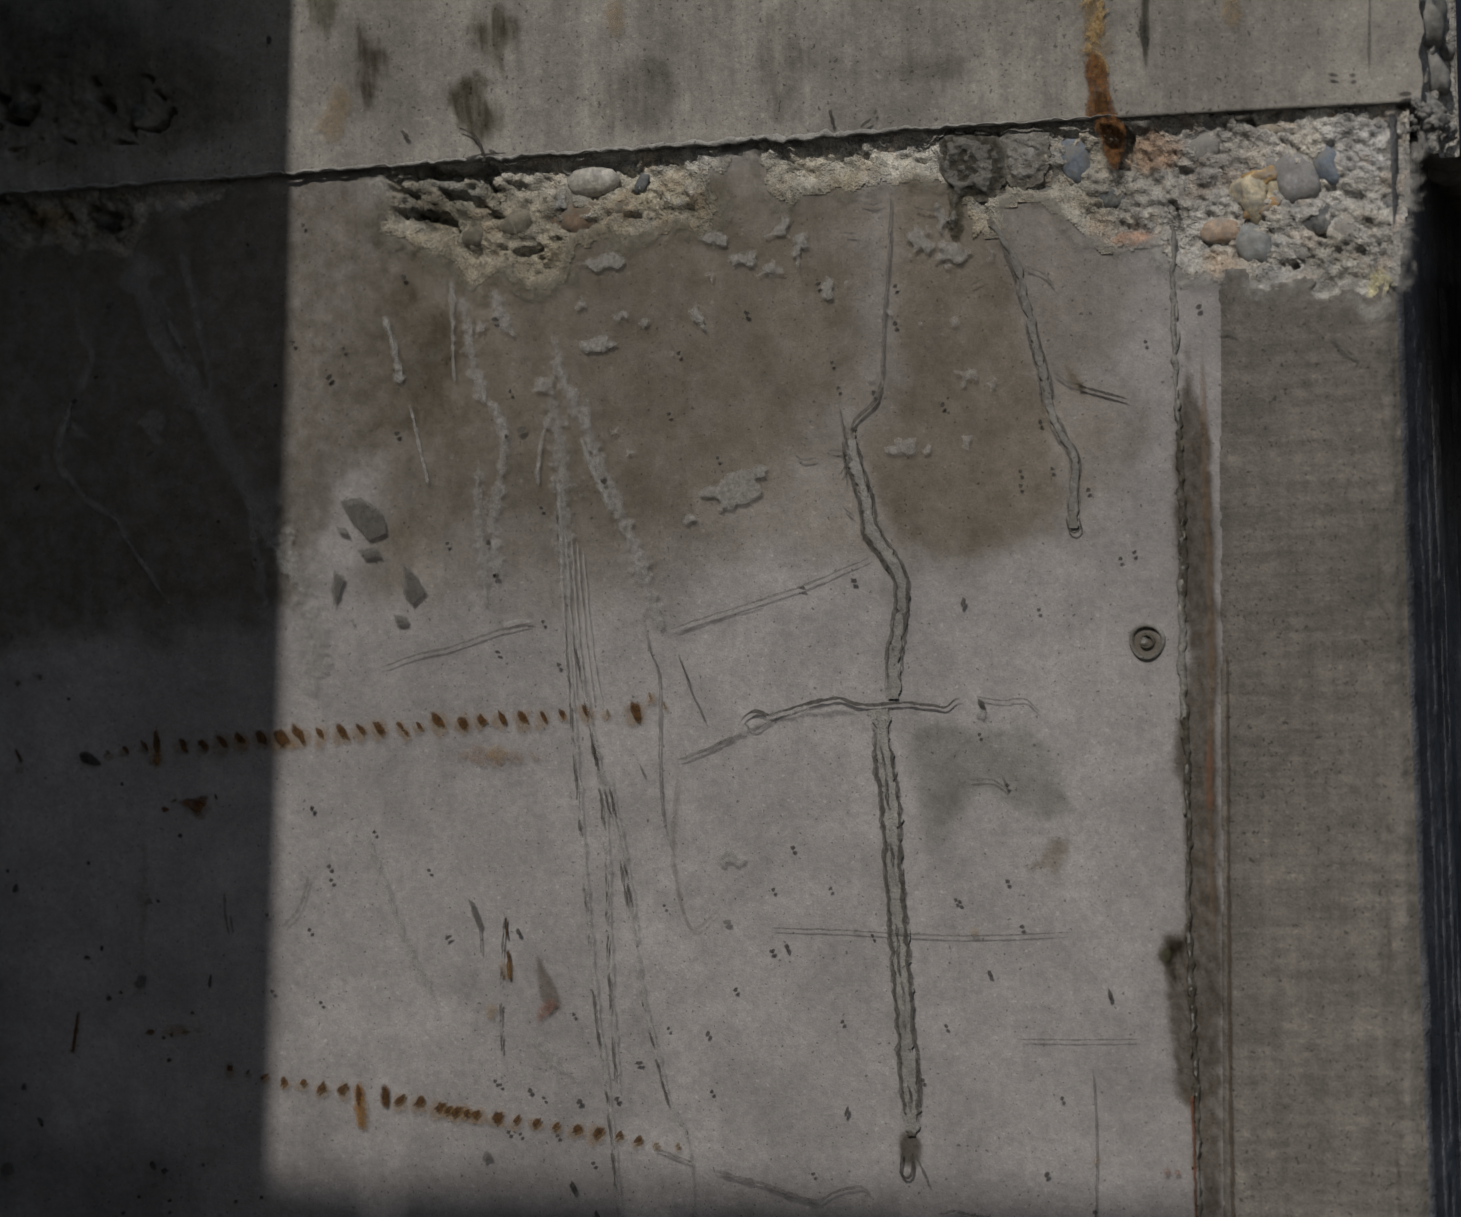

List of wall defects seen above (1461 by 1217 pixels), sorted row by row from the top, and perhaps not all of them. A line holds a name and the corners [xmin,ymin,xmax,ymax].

rust [1081,0,1125,168]
spalling [361,104,1424,328]
peeling [579,335,616,351]
water stain [554,360,663,627]
peeling [699,465,766,509]
crack [971,248,1126,534]
rust [179,709,565,752]
crack [388,516,615,831]
rust [630,692,665,722]
crack [640,201,1062,1182]
rust [227,1065,680,1147]
crack [583,864,668,1186]